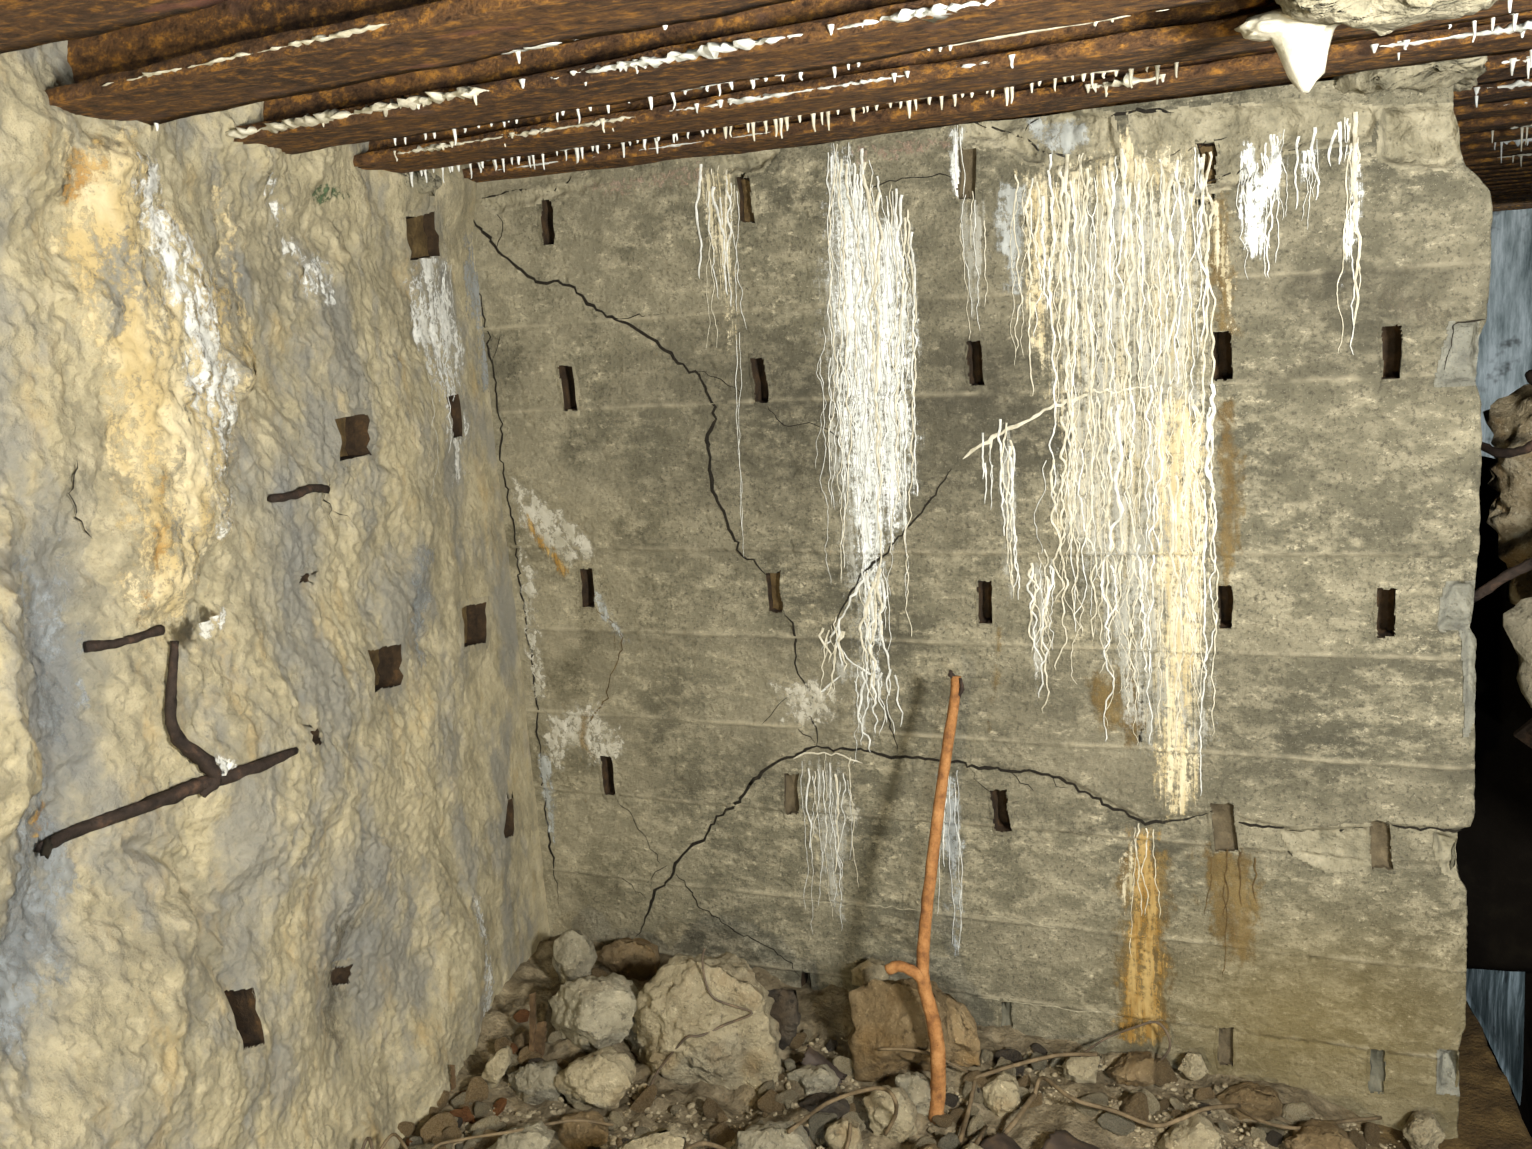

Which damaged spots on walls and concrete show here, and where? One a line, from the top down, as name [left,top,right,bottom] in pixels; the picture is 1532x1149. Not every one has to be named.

efflorescence [550,34,803,86]
efflorescence [827,0,995,35]
leakage [922,15,1129,68]
crack [473,177,840,575]
efflorescence [1236,112,1364,355]
crack [1444,319,1485,370]
crack [479,293,559,904]
crack [583,609,623,739]
leakage [393,62,1219,955]
crack [617,386,1461,977]
rust [1115,823,1172,1046]
rust [1197,844,1260,975]